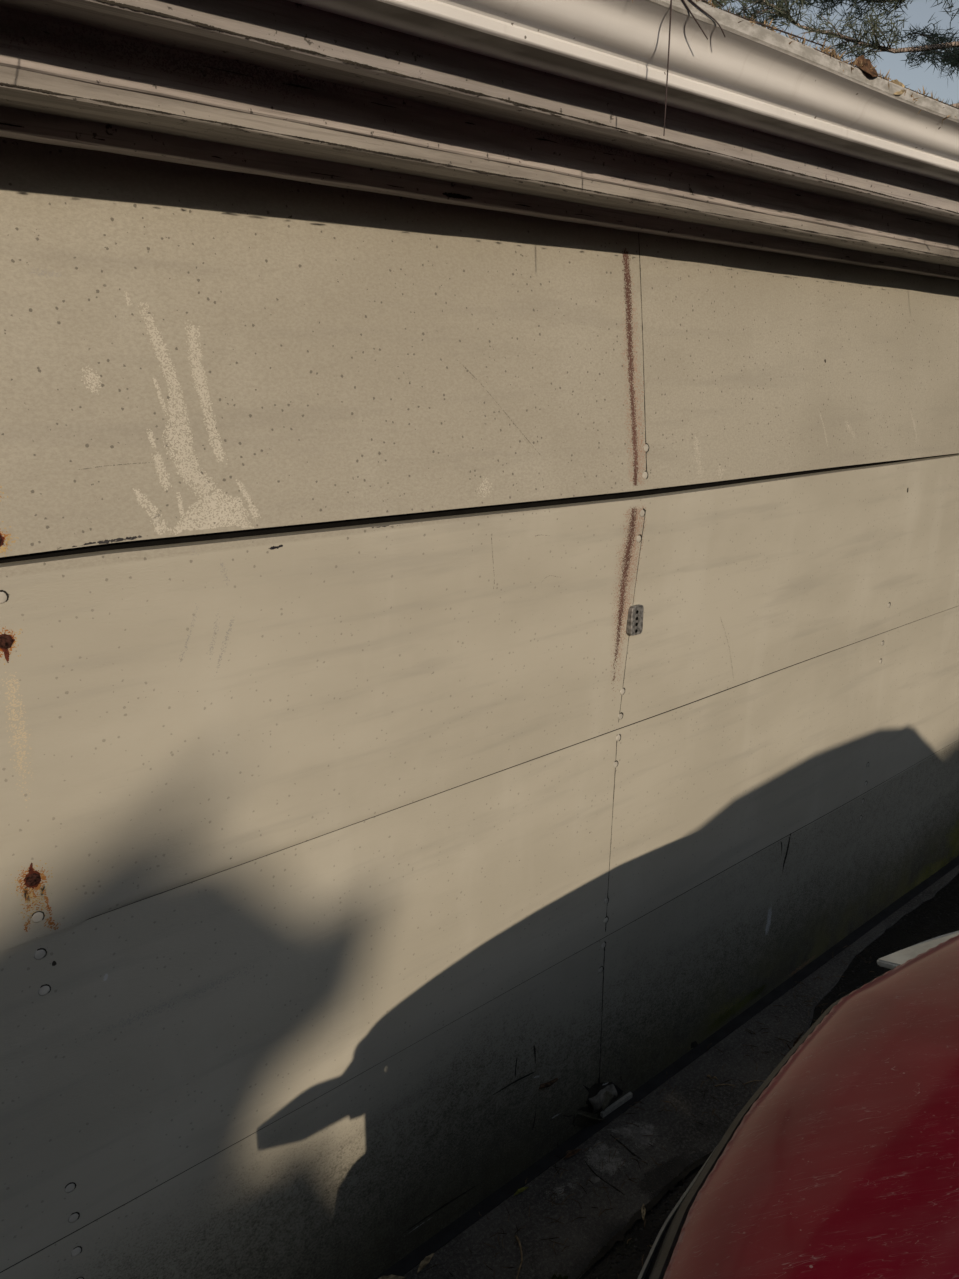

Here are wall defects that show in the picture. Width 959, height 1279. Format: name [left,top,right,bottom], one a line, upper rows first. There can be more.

corrosion [620,248,648,486]
corrosion [611,503,647,692]
corrosion [0,626,33,808]
corrosion [8,860,59,932]